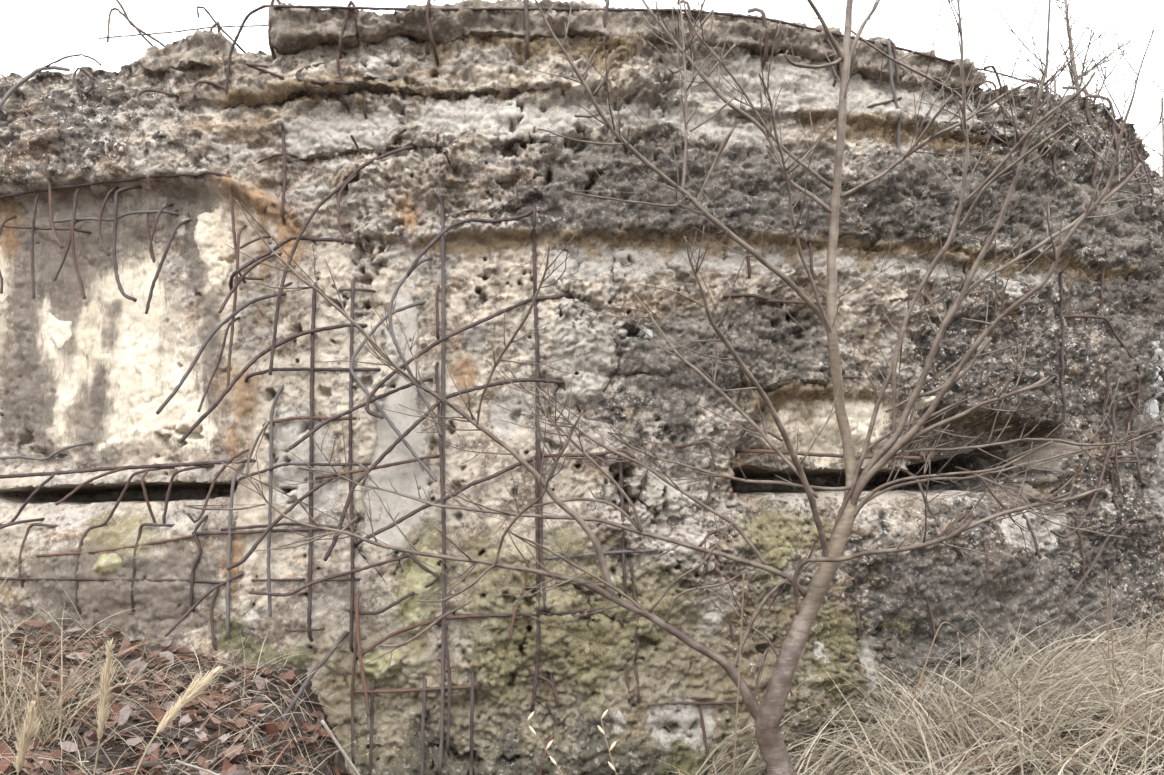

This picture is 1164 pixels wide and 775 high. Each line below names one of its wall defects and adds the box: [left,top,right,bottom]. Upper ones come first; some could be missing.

spalling [277,42,995,199]
rust [0,203,19,255]
peeling [194,204,235,294]
rust [214,177,305,269]
peeling [0,202,218,457]
damp [1,181,221,449]
rust [213,370,255,460]
peeling [264,401,345,520]
peeling [362,282,432,557]
peeling [489,395,534,441]
rust [223,530,245,600]
damp [359,624,688,775]